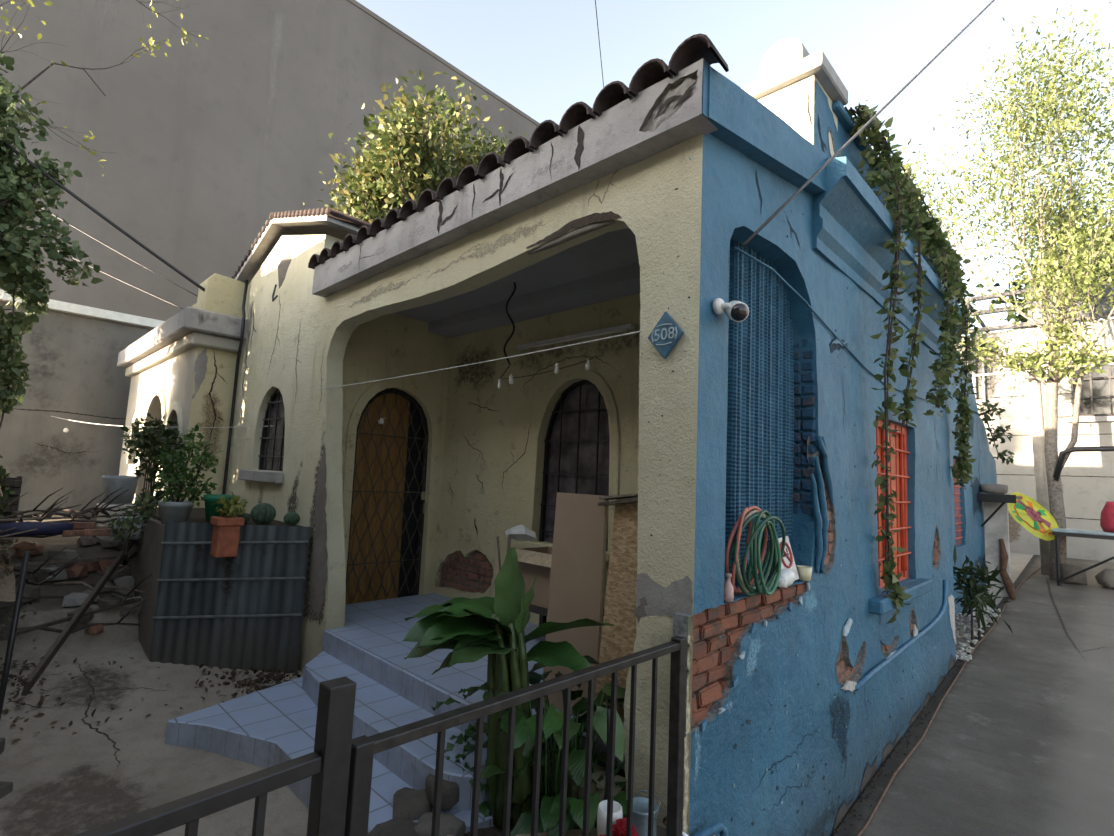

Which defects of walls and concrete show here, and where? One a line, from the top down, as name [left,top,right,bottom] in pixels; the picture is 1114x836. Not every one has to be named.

crack [2,661,167,777]
spalling [633,435,860,774]
spalling [796,595,956,836]
spalling [927,513,941,569]